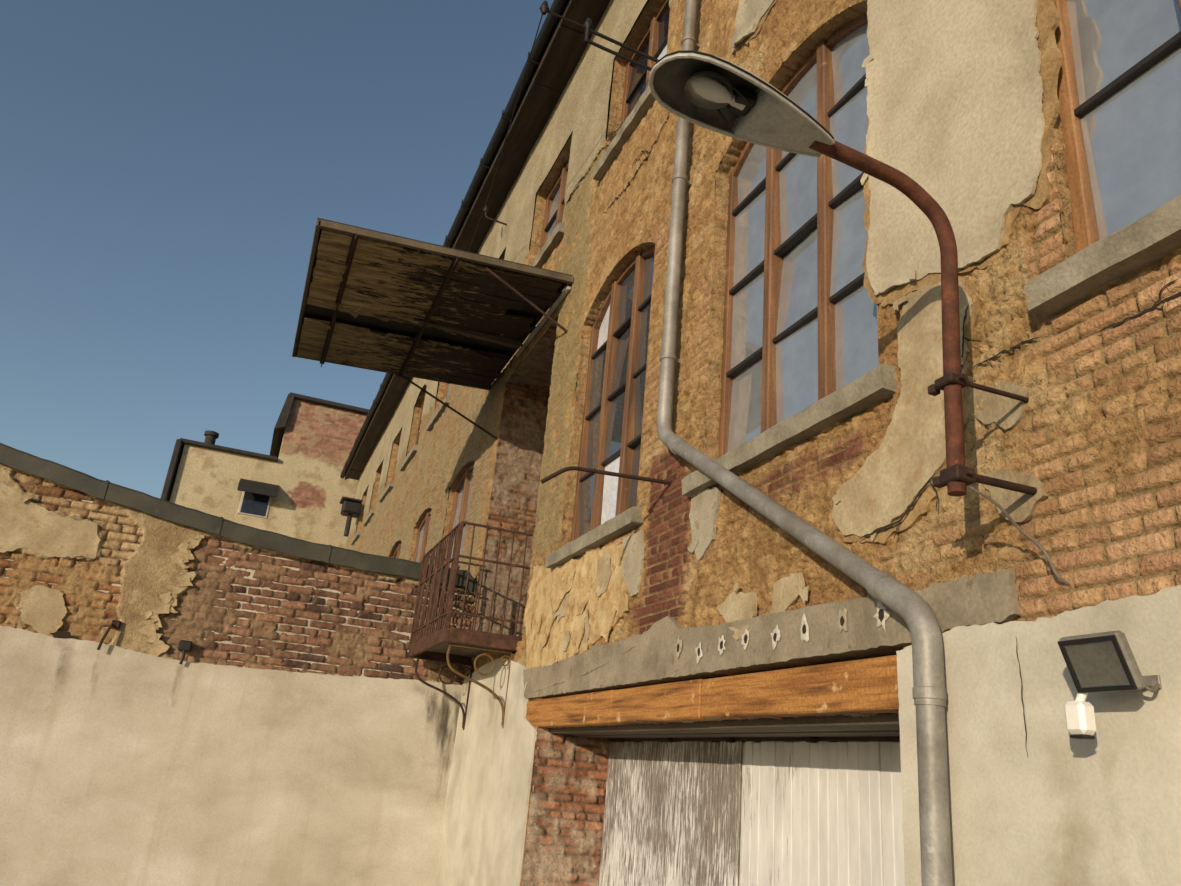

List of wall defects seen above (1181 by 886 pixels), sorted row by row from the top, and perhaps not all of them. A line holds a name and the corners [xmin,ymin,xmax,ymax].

flaking render [730,0,778,54]
flaking render [862,0,1068,428]
flaking render [753,173,946,544]
flaking render [0,470,142,645]
flaking render [137,531,475,685]
flaking render [523,453,703,669]
spalling [728,492,758,519]
flaking render [716,572,809,655]
damp [433,696,460,743]
crack [1016,639,1028,756]